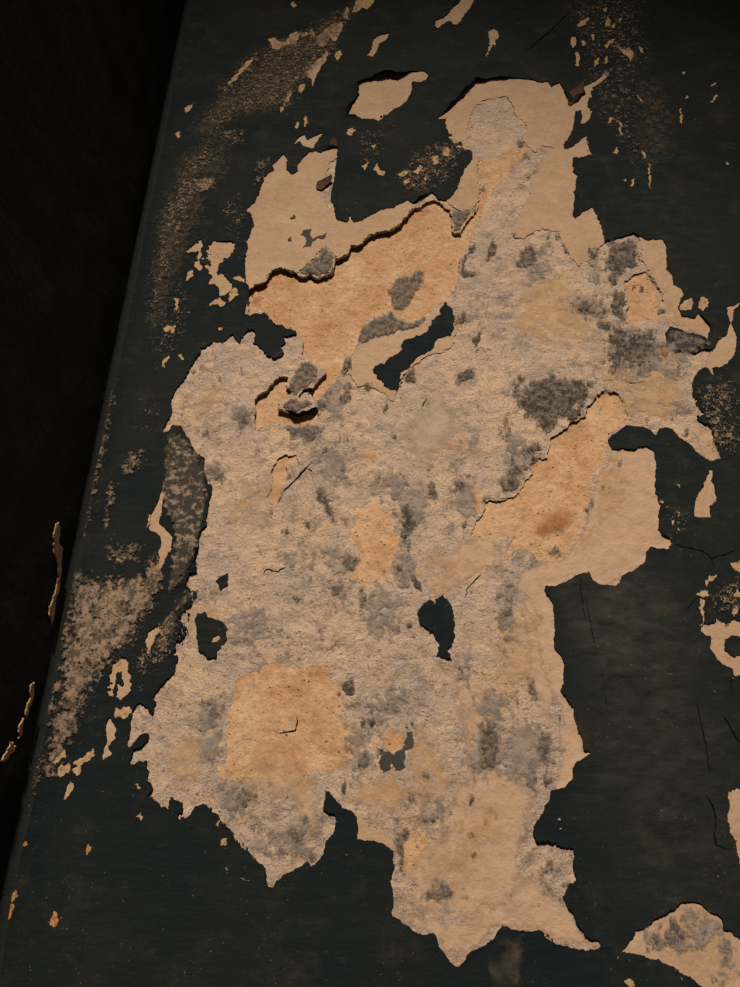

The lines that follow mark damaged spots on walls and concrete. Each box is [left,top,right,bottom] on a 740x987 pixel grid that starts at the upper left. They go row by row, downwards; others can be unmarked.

peeling [227,57,254,85]
peeling [268,0,374,112]
damp [461,239,497,276]
damp [512,232,711,425]
damp [280,358,372,523]
damp [449,367,594,531]
peeling [48,522,63,624]
damp [277,466,459,642]
peeling [102,71,740,967]
peeling [1,682,35,763]
peeling [52,749,95,800]
peeling [622,901,740,987]